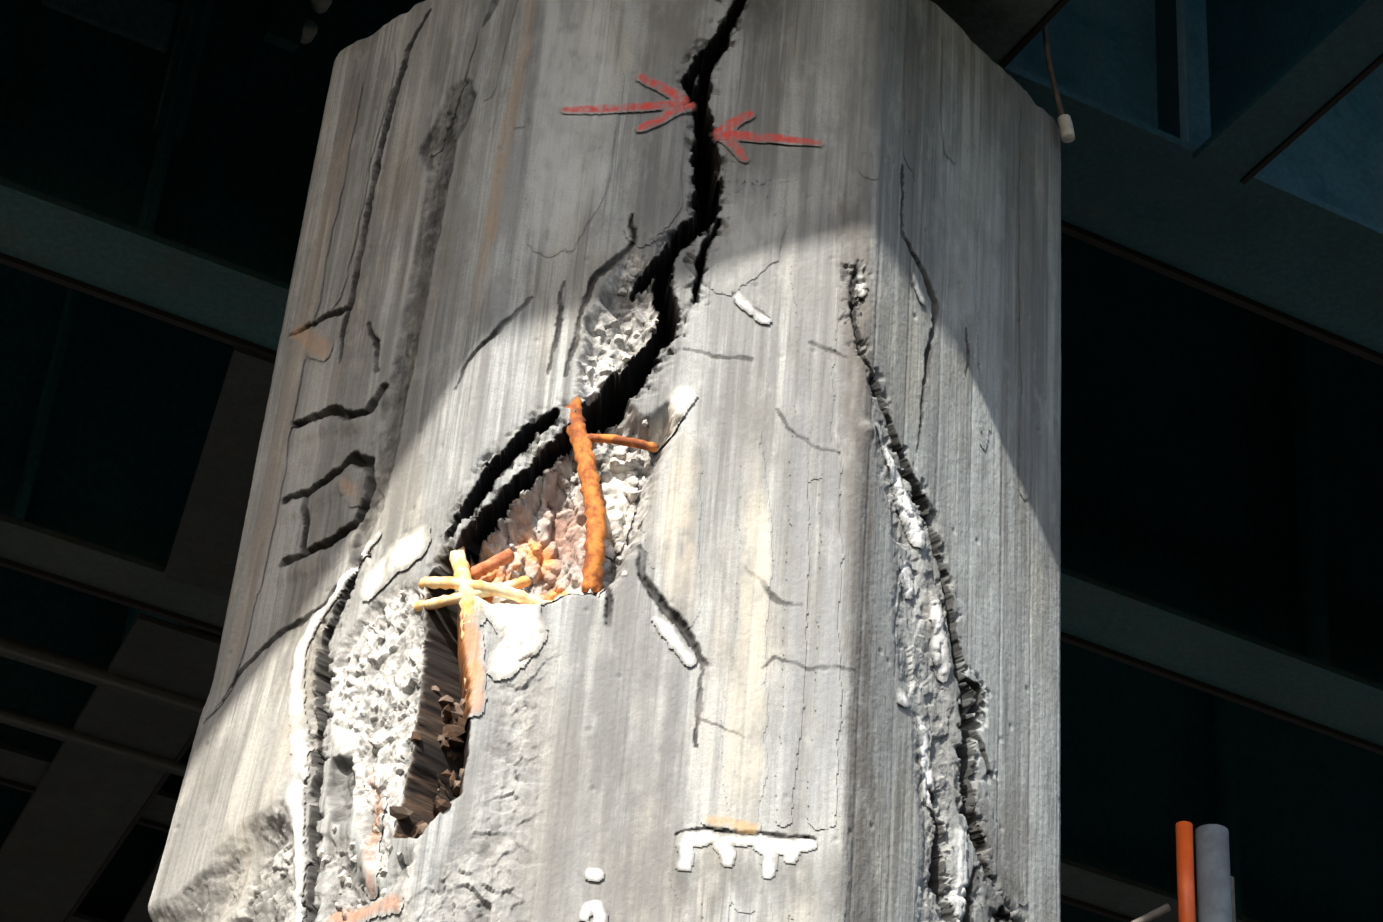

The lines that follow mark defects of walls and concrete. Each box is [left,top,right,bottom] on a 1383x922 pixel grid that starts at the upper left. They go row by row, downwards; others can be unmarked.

crack [204,8,433,922]
spalling [347,75,479,575]
spalling [172,249,687,922]
rust [457,597,488,738]
damp [430,0,624,327]
rust [479,455,605,605]
crack [430,0,772,594]
crack [605,542,723,748]
peeling [650,612,698,667]
damp [474,0,951,922]
crack [834,164,1013,922]
damp [976,80,995,450]